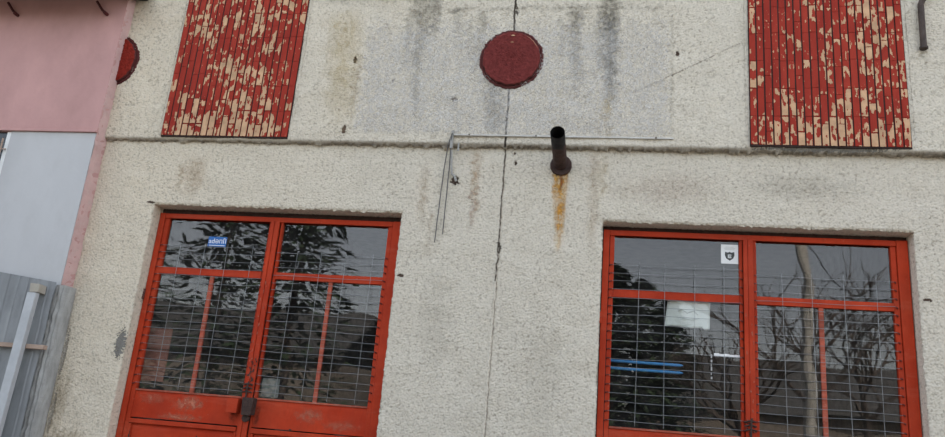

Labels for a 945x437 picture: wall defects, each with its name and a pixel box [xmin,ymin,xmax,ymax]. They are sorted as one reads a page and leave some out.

peeling [162,0,308,137]
crack [512,0,520,31]
peeling [745,0,911,153]
crack [485,89,510,429]
corrosion [553,176,564,230]